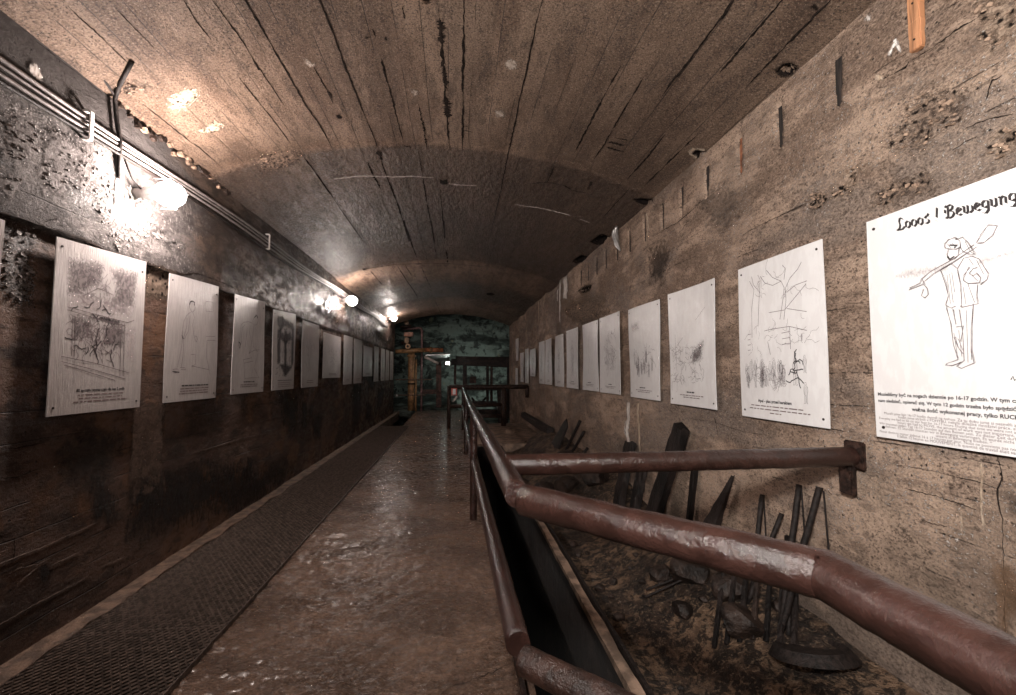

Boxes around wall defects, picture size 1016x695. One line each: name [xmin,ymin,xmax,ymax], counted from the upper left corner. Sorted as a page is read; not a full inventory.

spalling [973,0,1016,52]
spalling [882,81,971,160]
spalling [869,169,933,208]
crack [901,457,1004,568]